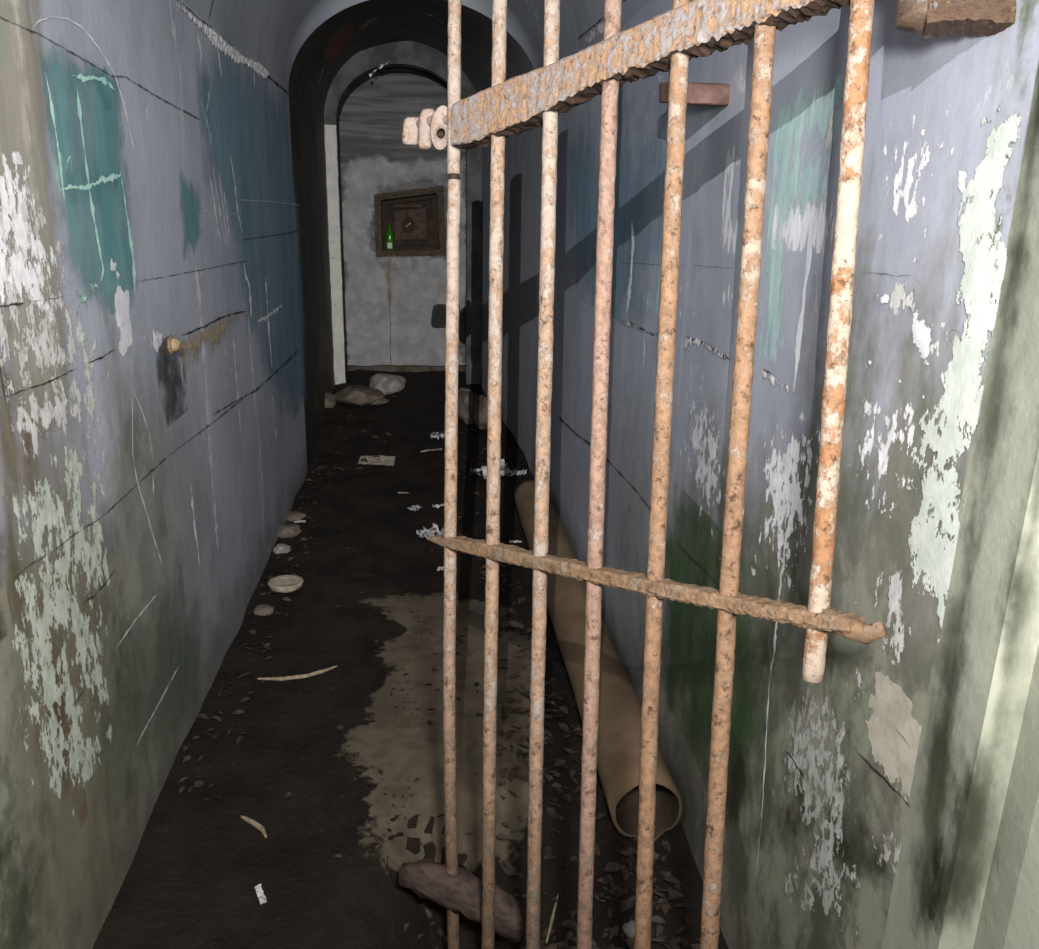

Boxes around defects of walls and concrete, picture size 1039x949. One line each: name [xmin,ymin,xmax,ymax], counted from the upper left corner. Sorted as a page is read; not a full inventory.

crack [0,17,199,119]
crack [578,0,625,39]
crack [0,296,63,308]
leakage [0,0,136,494]
leakage [170,2,304,411]
leakage [318,320,333,396]
peeling [0,150,133,801]
crack [85,569,115,602]
peeling [680,400,725,516]
peeling [751,403,821,591]
peeling [780,106,1021,949]
leakage [38,475,106,893]